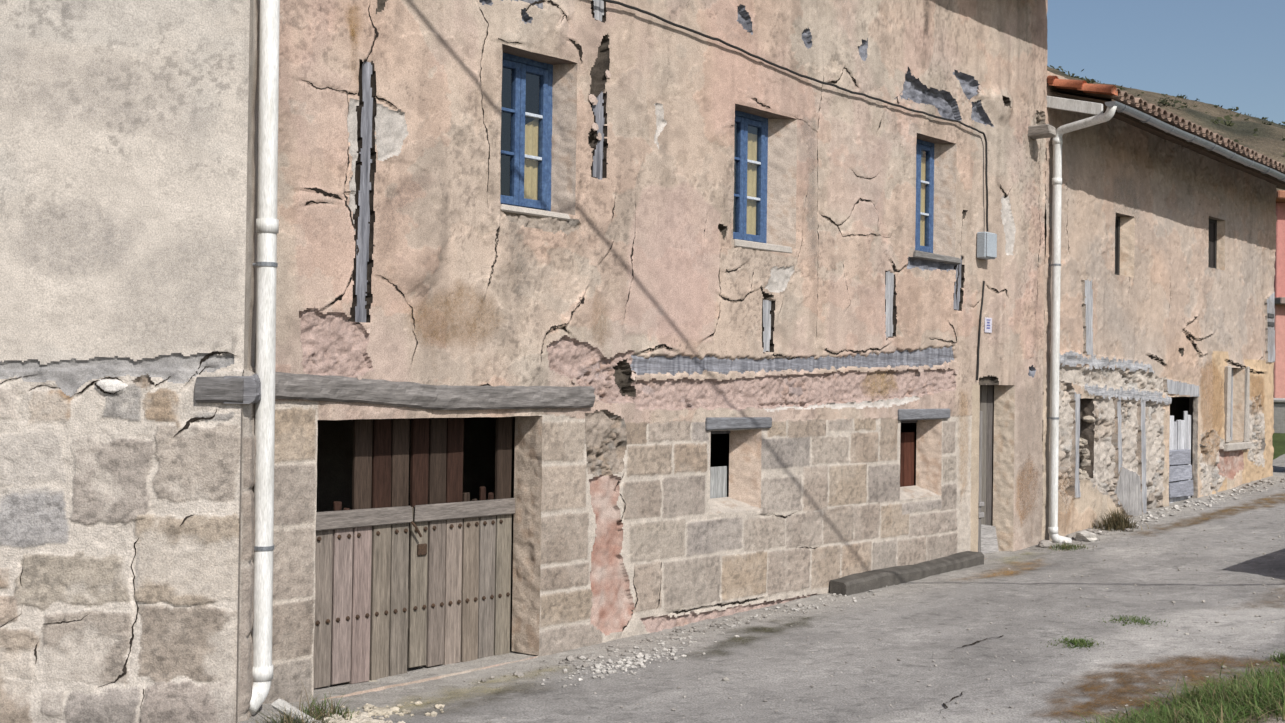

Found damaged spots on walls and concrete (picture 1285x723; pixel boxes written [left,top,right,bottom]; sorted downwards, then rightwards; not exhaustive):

peeling [347,98,359,231]
crack [303,5,418,364]
peeling [375,104,408,161]
crack [480,0,583,286]
crack [752,67,908,316]
spalling [894,67,994,127]
crack [0,351,237,397]
spalling [299,306,374,380]
spalling [546,335,959,636]
spalling [1058,363,1170,513]
crack [1169,284,1264,374]
crack [100,538,144,722]